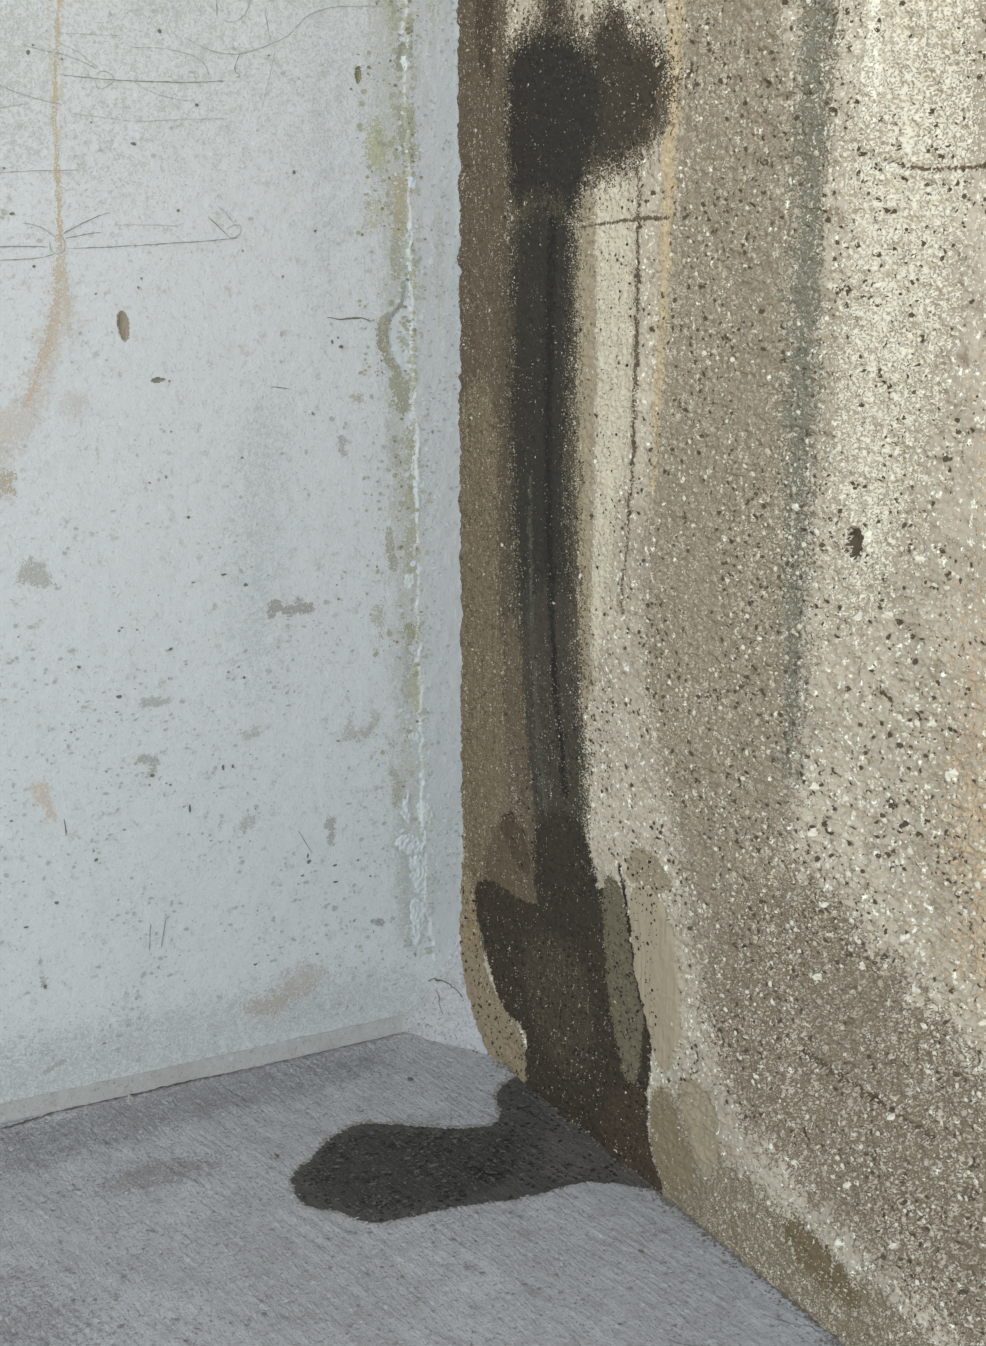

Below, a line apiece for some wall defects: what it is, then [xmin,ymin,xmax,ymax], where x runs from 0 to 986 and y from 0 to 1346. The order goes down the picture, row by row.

corrosion [0,0,84,500]
crack [579,215,670,230]
crack [884,156,986,173]
leakage [0,0,450,1104]